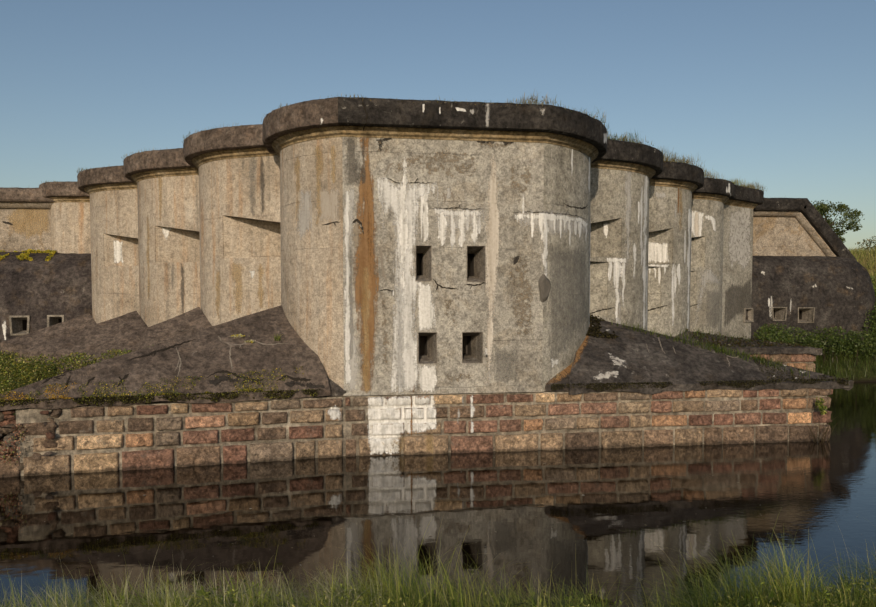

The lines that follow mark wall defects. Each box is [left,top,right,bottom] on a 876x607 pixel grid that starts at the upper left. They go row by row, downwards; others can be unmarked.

corrosion [354,137,379,391]
damp [366,157,501,455]
crack [433,279,485,290]
damp [515,194,591,326]
damp [607,173,716,330]